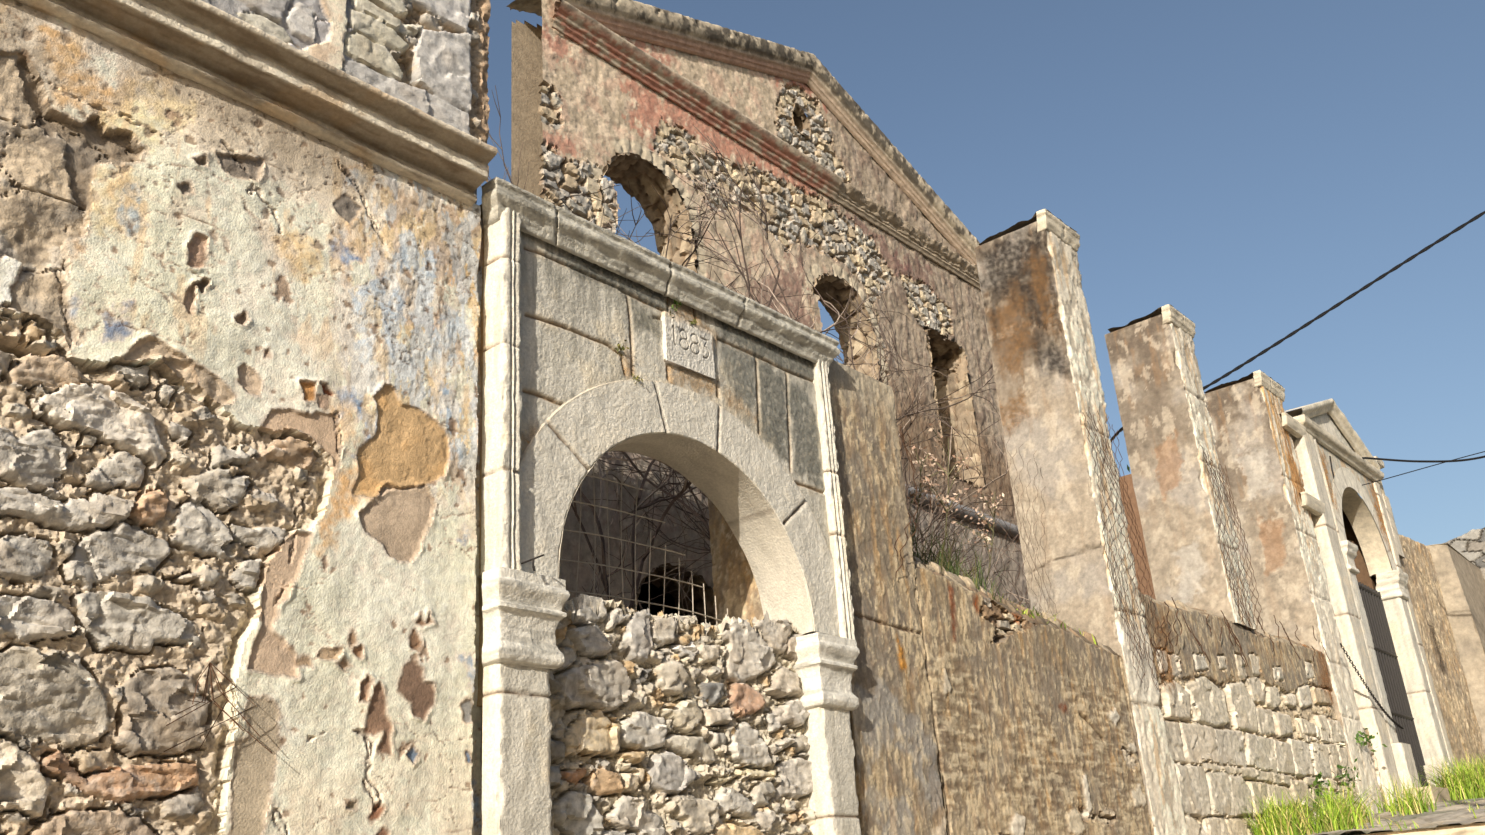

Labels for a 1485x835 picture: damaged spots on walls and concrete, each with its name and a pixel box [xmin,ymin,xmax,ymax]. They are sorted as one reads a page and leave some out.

spalling [391,52,422,85]
spalling [0,50,364,835]
flaking render [352,383,451,563]
spalling [979,597,1032,644]
flaking render [359,614,437,764]
flaking render [460,699,474,725]
flaking render [346,800,389,835]